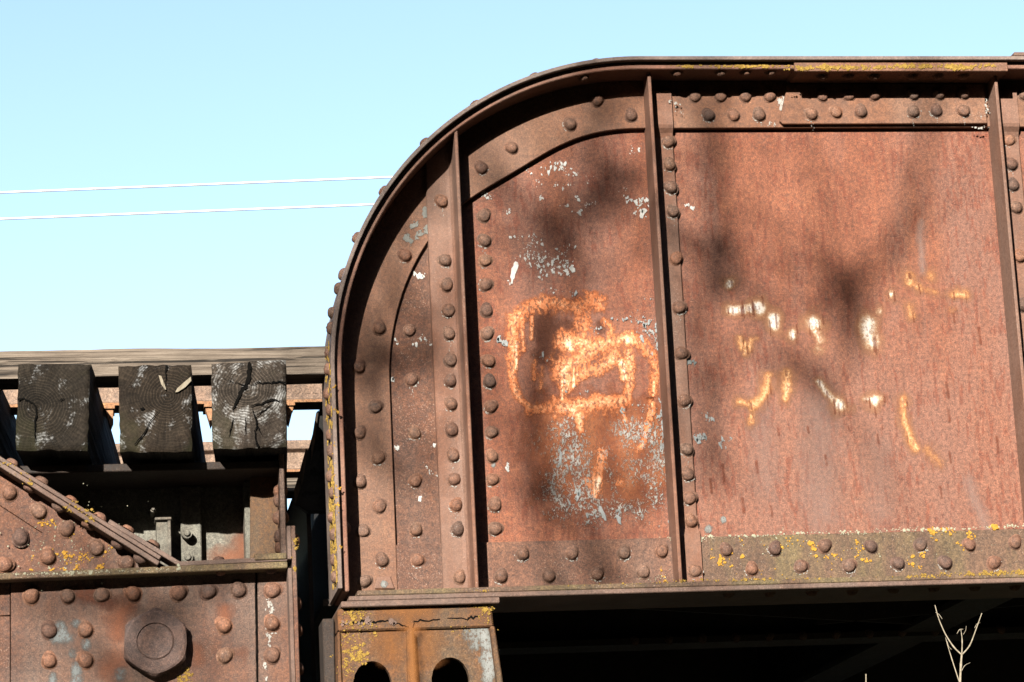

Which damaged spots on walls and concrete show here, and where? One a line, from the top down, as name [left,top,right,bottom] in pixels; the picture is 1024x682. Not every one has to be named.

peeling [526,161,596,216]
peeling [623,188,649,218]
peeling [507,234,576,294]
peeling [593,296,658,361]
corrosion [726,296,821,342]
corrosion [861,311,881,351]
corrosion [505,290,666,511]
corrosion [736,370,791,423]
corrosion [817,380,845,412]
corrosion [900,397,919,452]
peeling [527,397,669,536]